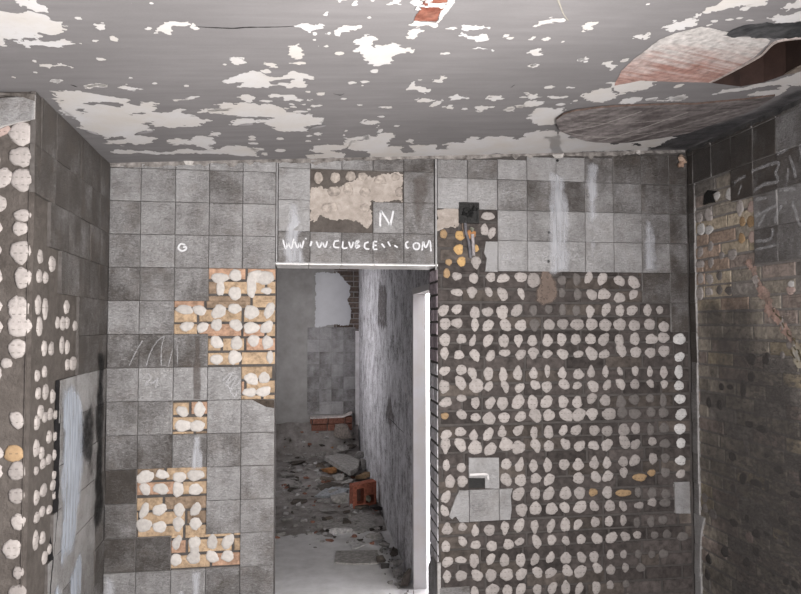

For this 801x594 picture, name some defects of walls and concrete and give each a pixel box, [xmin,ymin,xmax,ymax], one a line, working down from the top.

peeling [0,0,82,48]
crack [195,23,294,31]
peeling [294,12,425,86]
peeling [662,0,768,32]
peeling [767,0,801,23]
peeling [50,43,688,159]
peeling [712,72,801,96]
peeling [310,169,403,233]
flaking render [334,268,359,331]
peeling [174,268,276,408]
peeling [173,401,207,434]
peeling [136,467,240,569]